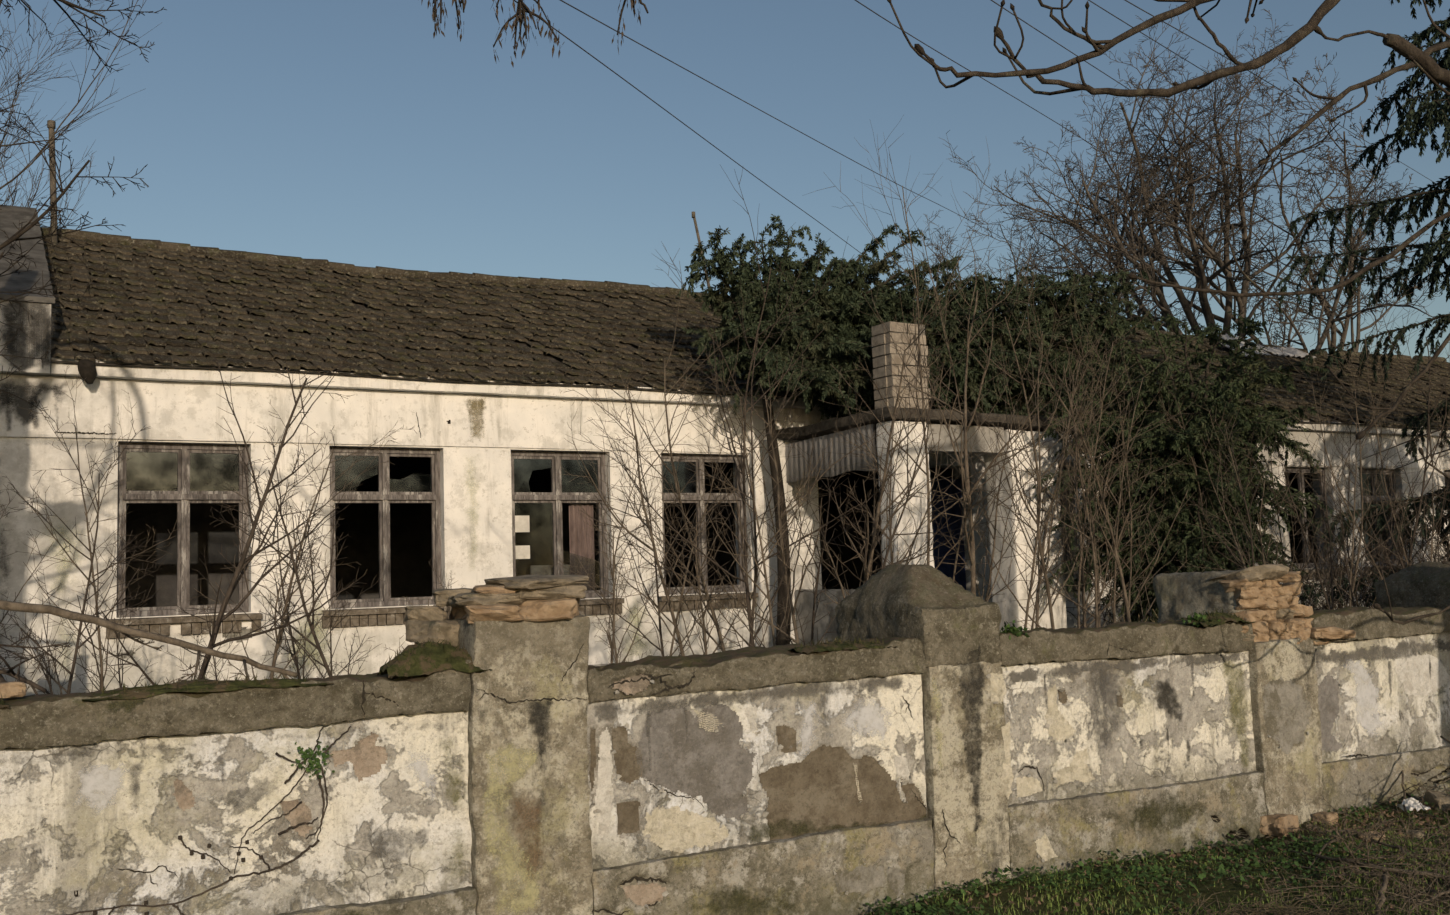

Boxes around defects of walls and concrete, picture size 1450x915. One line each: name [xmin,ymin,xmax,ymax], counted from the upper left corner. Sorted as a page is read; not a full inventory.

water stain [469,400,484,436]
spalling [1057,688,1068,704]
peeling [1307,674,1343,753]
spalling [329,732,395,782]
peeling [589,704,928,841]
spalling [173,775,196,816]
spalling [280,799,316,837]